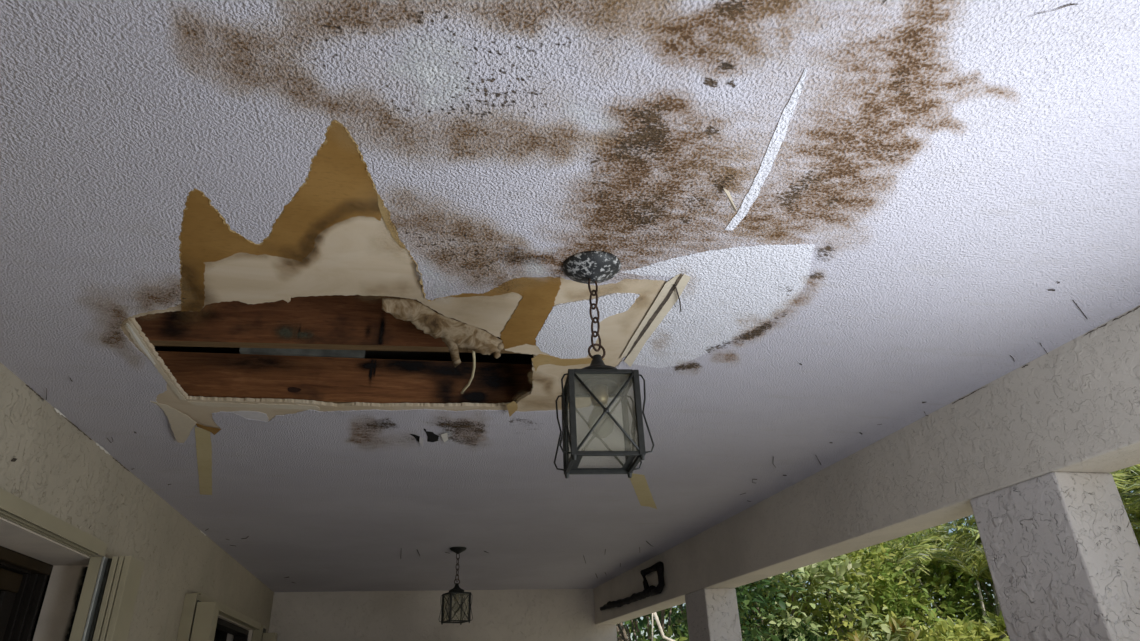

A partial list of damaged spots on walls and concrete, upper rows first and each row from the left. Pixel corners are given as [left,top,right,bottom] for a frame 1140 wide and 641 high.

leakage [178,0,1004,293]
peeling [178,119,640,371]
leakage [138,283,212,337]
leakage [706,243,835,361]
leakage [360,359,516,404]
mould [350,418,414,445]
mould [426,418,485,446]